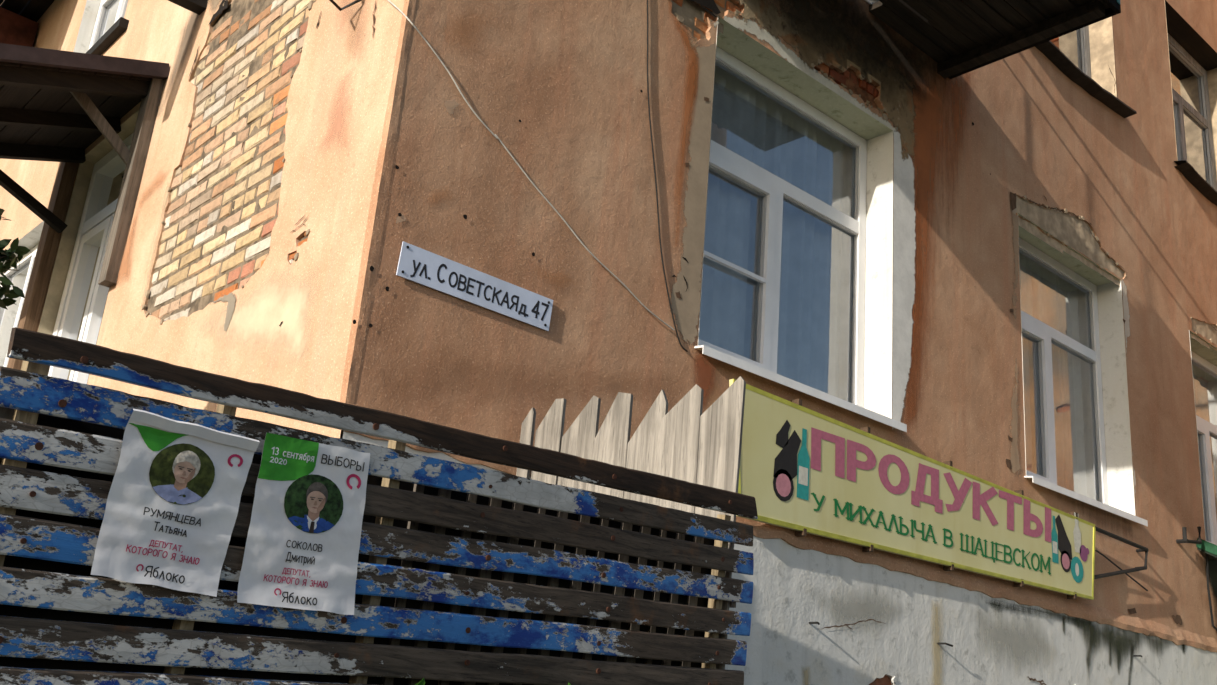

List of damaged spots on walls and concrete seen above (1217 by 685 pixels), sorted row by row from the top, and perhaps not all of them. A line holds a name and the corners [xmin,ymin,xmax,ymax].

flaking render [142,0,316,325]
peeling [670,0,916,344]
spalling [869,675,897,685]
damp [990,601,1166,685]